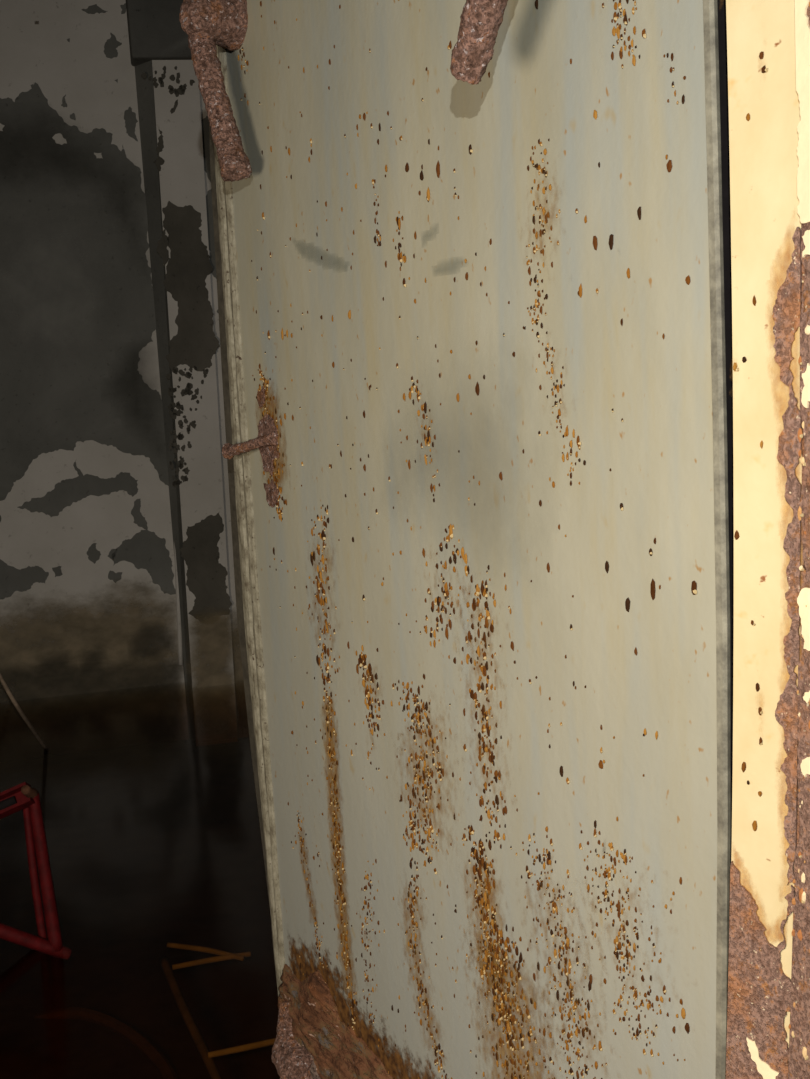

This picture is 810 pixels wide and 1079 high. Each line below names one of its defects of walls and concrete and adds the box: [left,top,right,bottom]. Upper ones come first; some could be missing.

peeling [141,66,195,114]
corrosion [344,111,403,145]
peeling [795,0,810,258]
corrosion [405,163,430,202]
corrosion [593,234,613,251]
corrosion [523,139,586,486]
peeling [0,83,232,621]
peeling [801,363,810,408]
corrosion [252,352,303,522]
peeling [797,587,810,651]
corrosion [279,504,689,1079]
peeling [800,757,810,777]